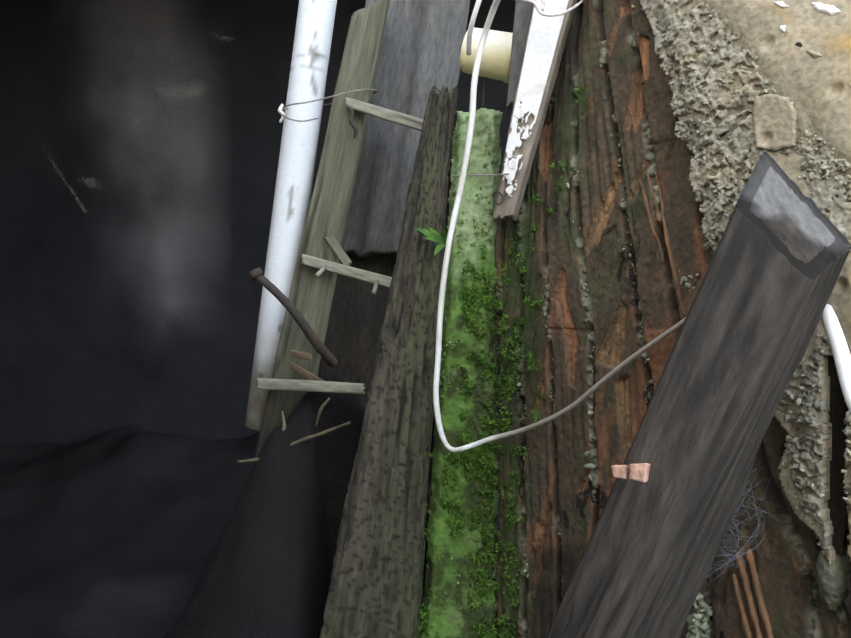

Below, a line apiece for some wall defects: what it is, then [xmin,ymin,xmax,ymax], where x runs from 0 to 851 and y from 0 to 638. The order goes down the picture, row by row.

peeling [502,0,569,197]
spalling [573,0,851,317]
spalling [776,334,837,561]
spalling [841,400,851,514]